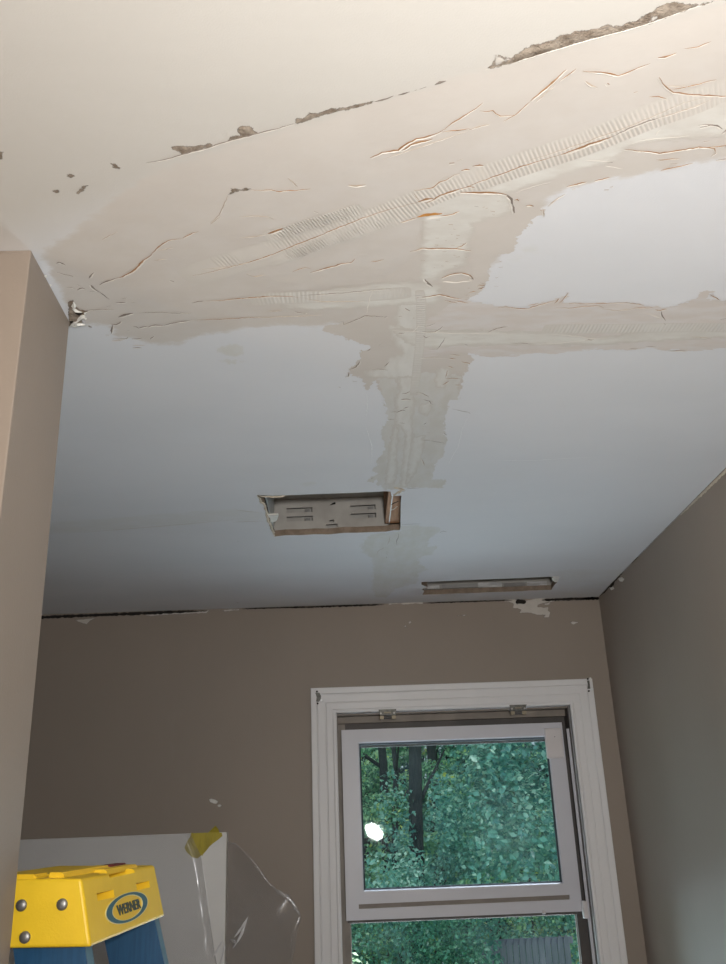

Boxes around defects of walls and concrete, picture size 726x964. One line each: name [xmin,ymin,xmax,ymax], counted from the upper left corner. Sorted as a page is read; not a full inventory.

crack [57,42,726,464]
peeling [508,598,555,618]